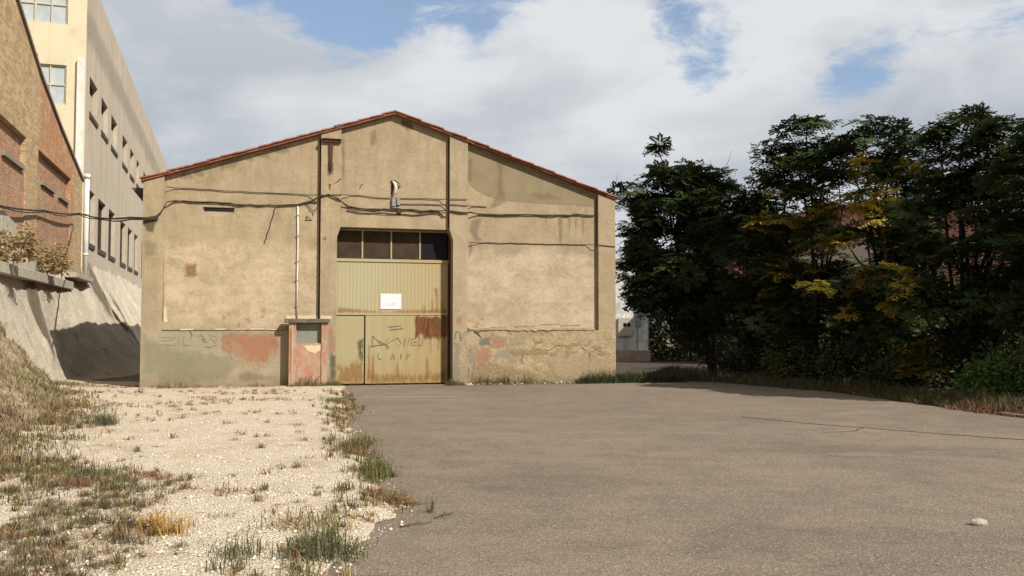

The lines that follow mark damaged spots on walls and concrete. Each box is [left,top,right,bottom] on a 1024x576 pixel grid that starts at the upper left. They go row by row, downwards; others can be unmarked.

peeling [215,315,332,358]
corrosion [415,316,448,339]